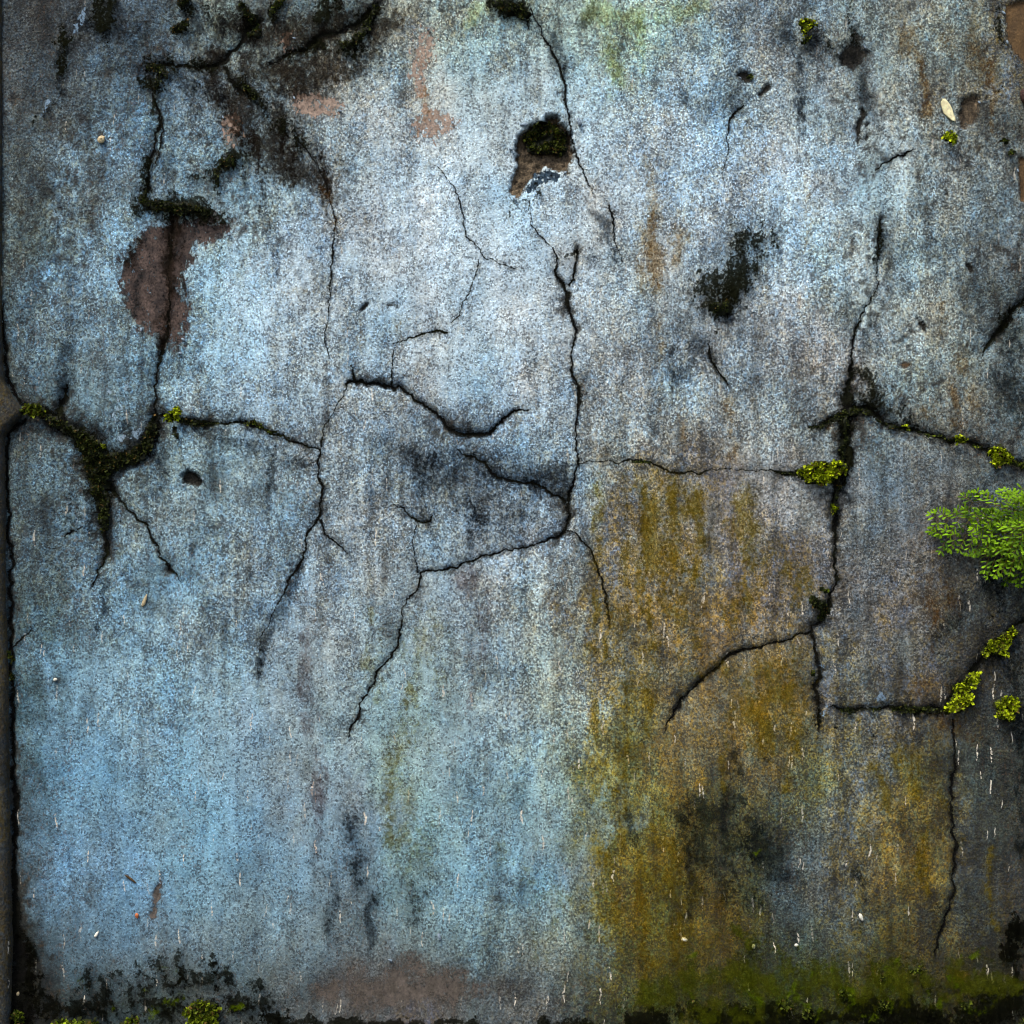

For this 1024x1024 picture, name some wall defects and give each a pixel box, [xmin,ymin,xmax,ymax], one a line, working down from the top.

crack [145,19,262,191]
spalling [509,116,582,201]
crack [530,8,623,262]
crack [722,104,744,180]
crack [875,149,913,171]
peeling [114,210,242,359]
water stain [691,214,779,334]
crack [1,141,796,1024]
crack [663,219,990,958]
water stain [10,933,479,1024]
water stain [537,1015,600,1024]
water stain [624,911,1024,1024]